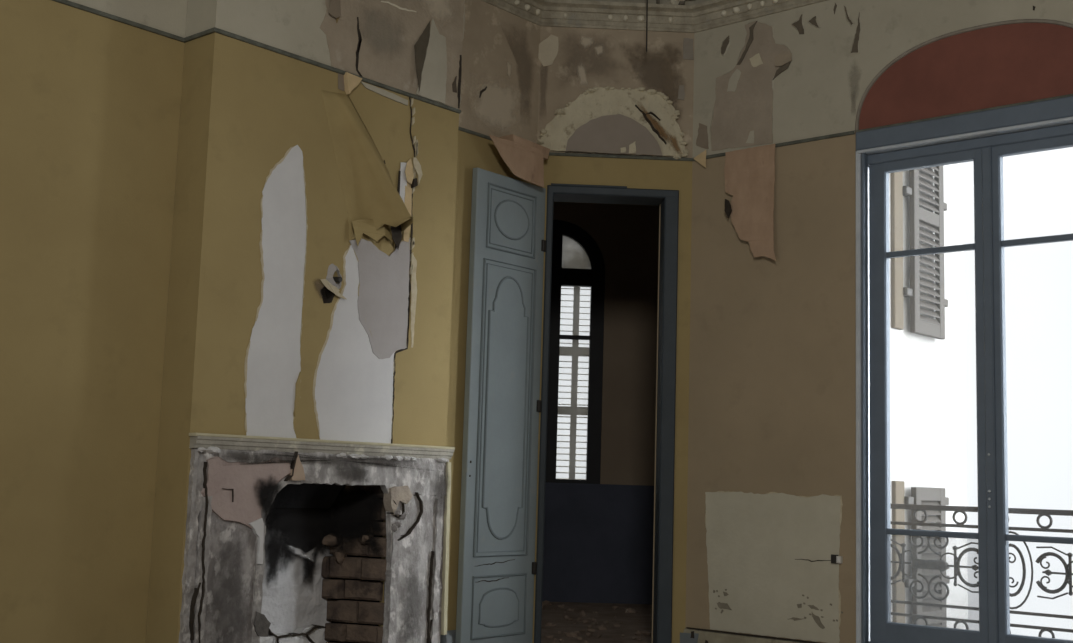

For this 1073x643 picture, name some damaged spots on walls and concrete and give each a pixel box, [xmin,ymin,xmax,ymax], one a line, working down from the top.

spalling [537,86,689,159]
spalling [320,264,346,303]
spalling [198,447,305,643]
spalling [382,486,412,643]
peeling [690,491,843,643]